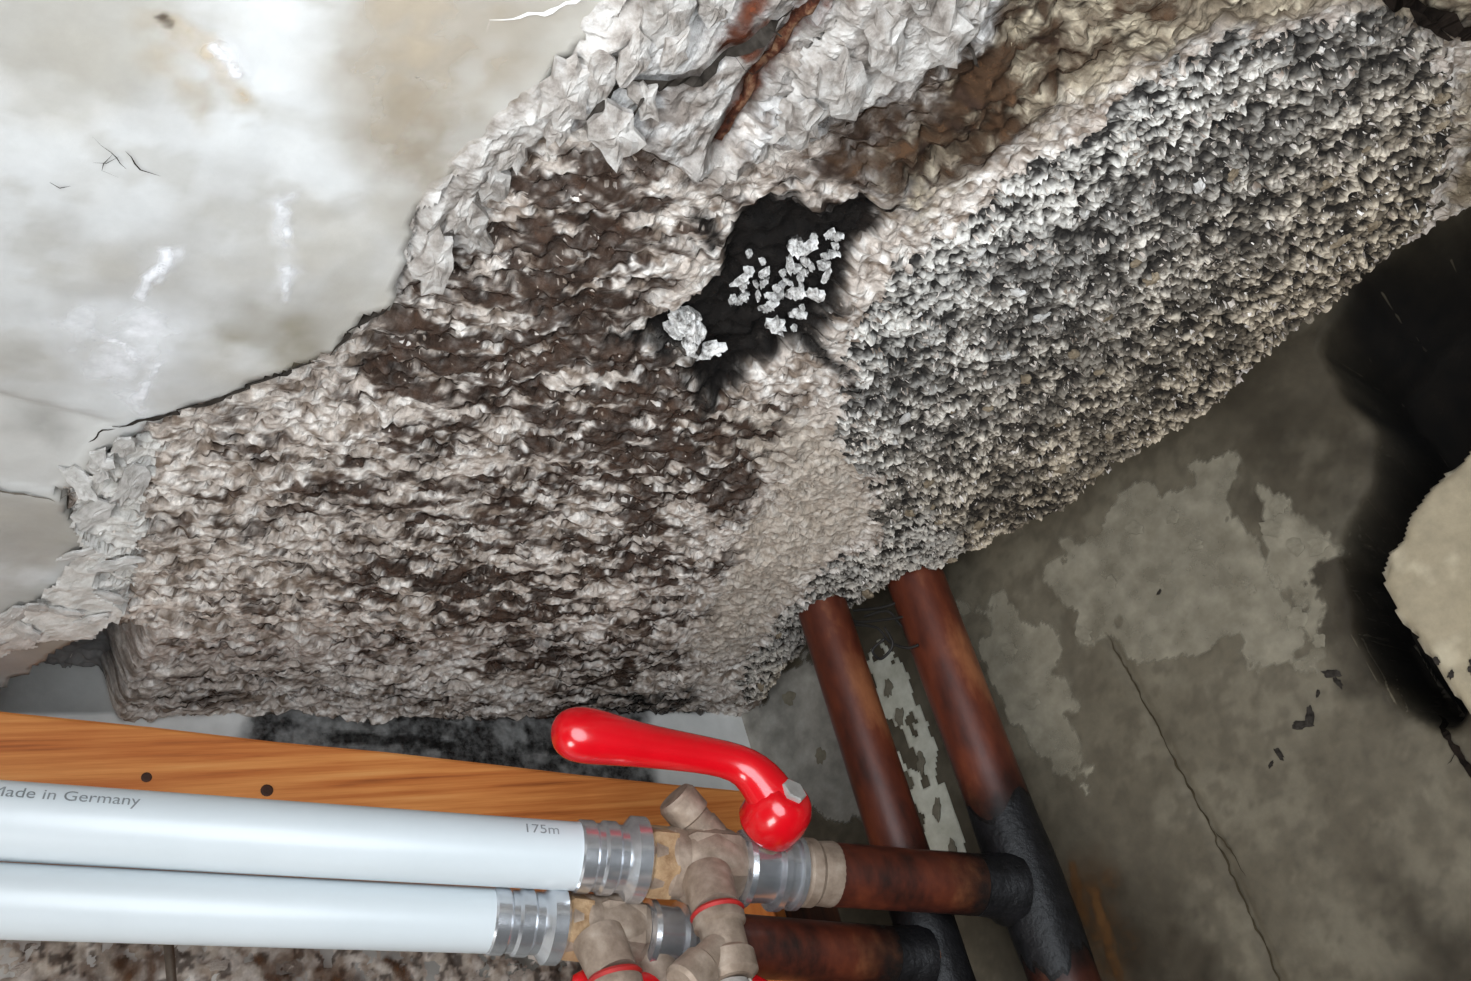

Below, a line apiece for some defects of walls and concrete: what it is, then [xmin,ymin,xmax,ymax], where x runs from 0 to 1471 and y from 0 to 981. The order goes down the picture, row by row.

rust [714,0,830,140]
crack [0,490,76,501]
water stain [163,0,1179,783]
spalling [0,0,1471,725]
flaking render [955,452,1346,795]
flaking render [741,651,861,823]
flaking render [867,639,967,853]
crack [1107,635,1280,981]
flaking render [0,940,582,981]